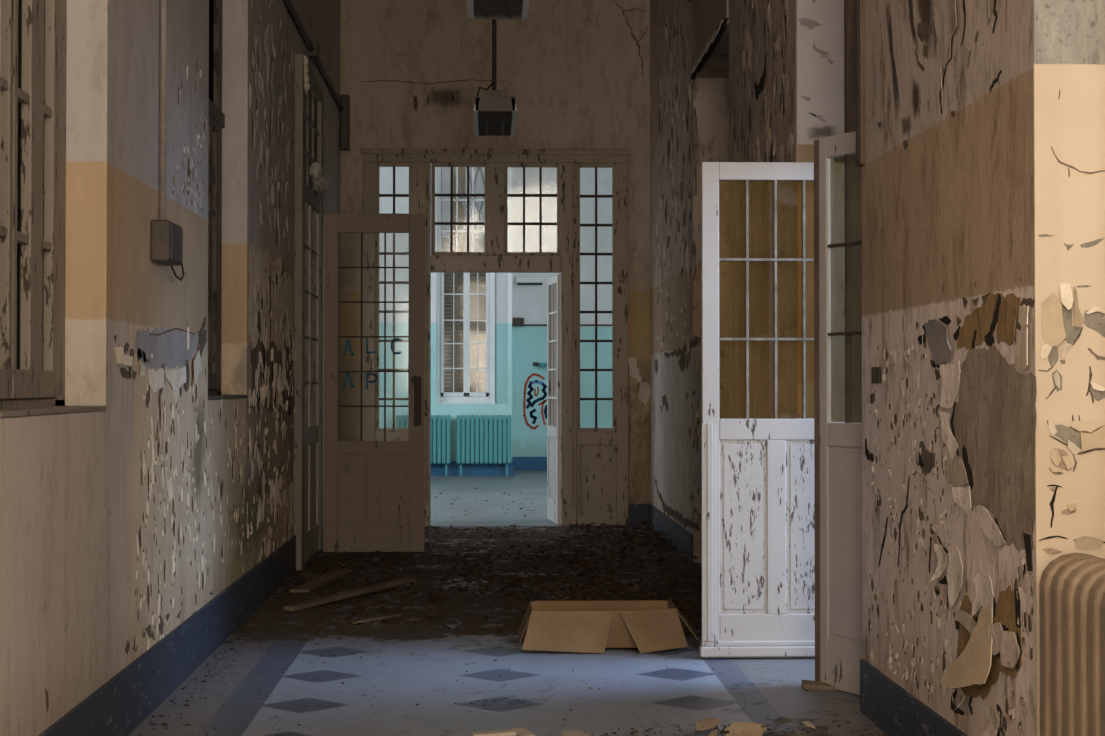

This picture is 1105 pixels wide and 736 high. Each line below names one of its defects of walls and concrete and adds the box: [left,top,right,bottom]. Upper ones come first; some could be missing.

crack [939,0,998,114]
crack [990,70,1002,89]
crack [1051,147,1105,177]
flaking render [655,0,834,531]
peeling [1064,238,1104,250]
peeling [114,0,297,655]
flaking render [866,283,1105,736]